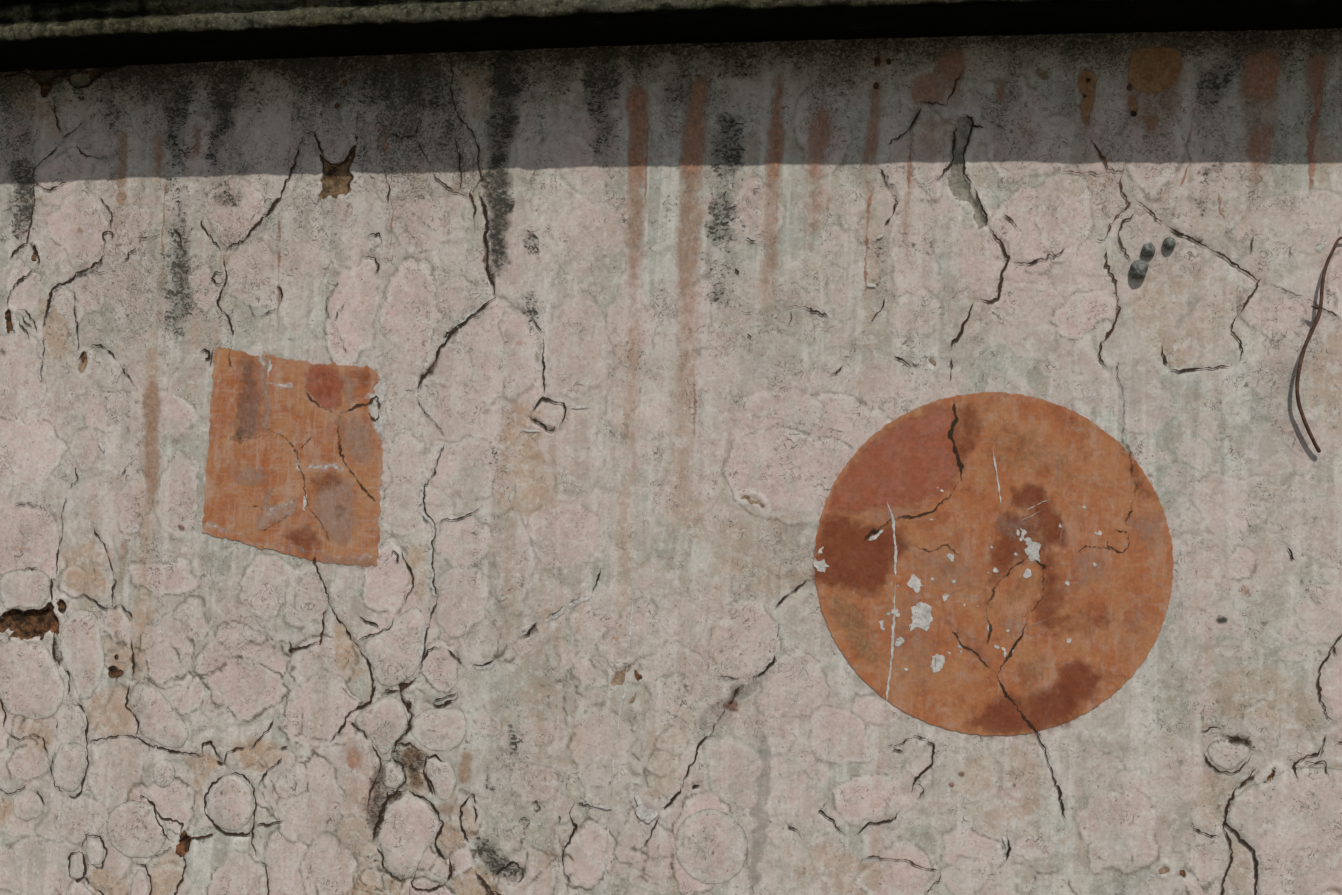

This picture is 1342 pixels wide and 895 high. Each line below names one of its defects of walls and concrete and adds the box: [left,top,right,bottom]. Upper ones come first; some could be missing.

flaking render [318,145,356,199]
rust [627,88,649,199]
leakage [0,28,1342,346]
rust [1078,70,1096,125]
rust [1128,48,1182,130]
rust [1306,77,1325,187]
crack [864,68,1338,554]
crack [0,58,524,895]
flaking render [0,599,66,640]
crack [644,580,806,846]
crack [788,735,941,894]
crack [1192,727,1259,895]